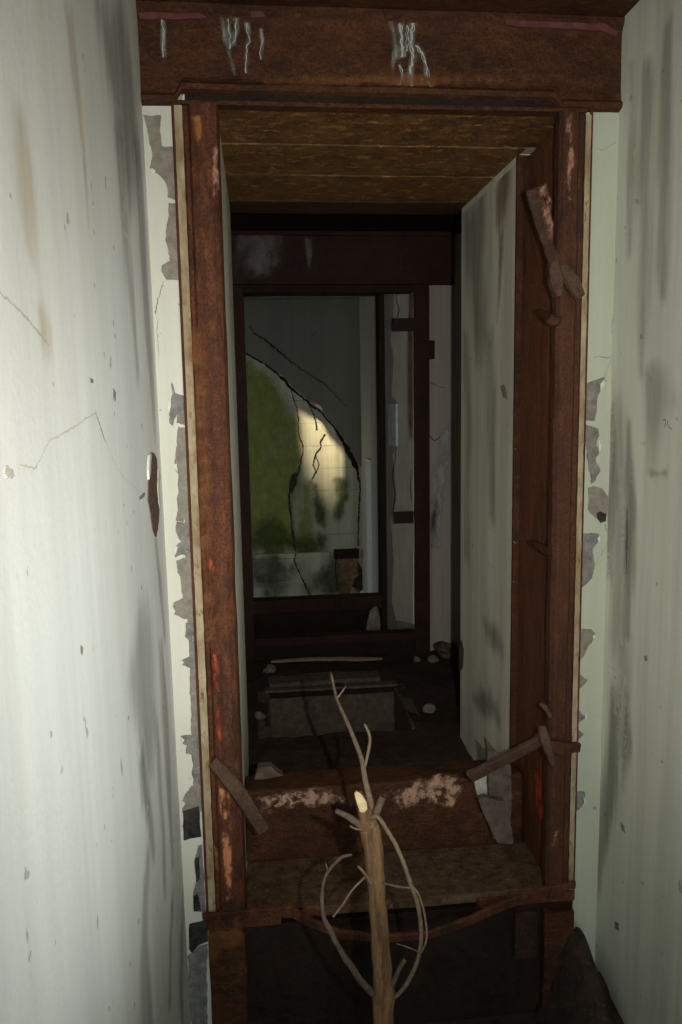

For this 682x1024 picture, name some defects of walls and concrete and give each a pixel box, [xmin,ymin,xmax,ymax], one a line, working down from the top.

peeling [193,115,202,141]
peeling [143,115,181,282]
crack [20,412,142,493]
spalling [139,452,162,537]
crack [246,326,361,595]
peeling [582,377,608,587]
peeling [167,383,232,953]
peeling [580,628,595,688]
peeling [260,788,344,808]
peeling [395,774,461,807]